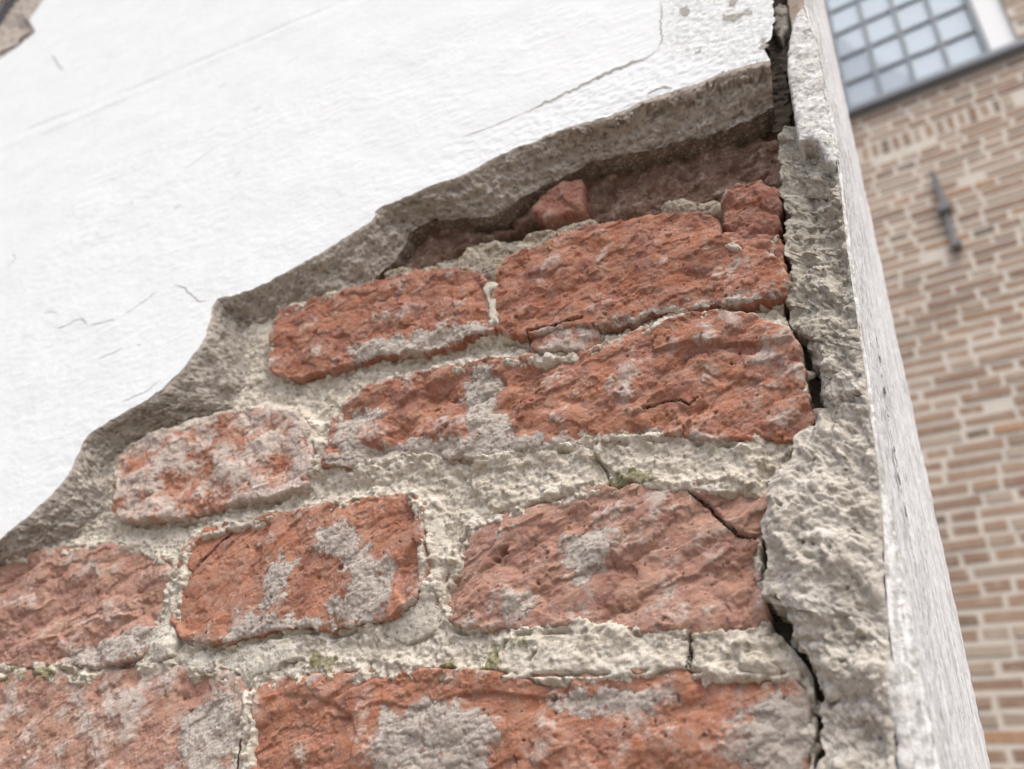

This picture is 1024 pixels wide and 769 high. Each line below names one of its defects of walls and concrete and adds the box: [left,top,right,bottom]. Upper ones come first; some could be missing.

peeling [461,1,663,138]
crack [767,0,792,132]
flaking render [0,61,821,769]
crack [786,317,825,408]
crack [689,493,768,570]
crack [685,639,693,673]
crack [773,614,826,760]